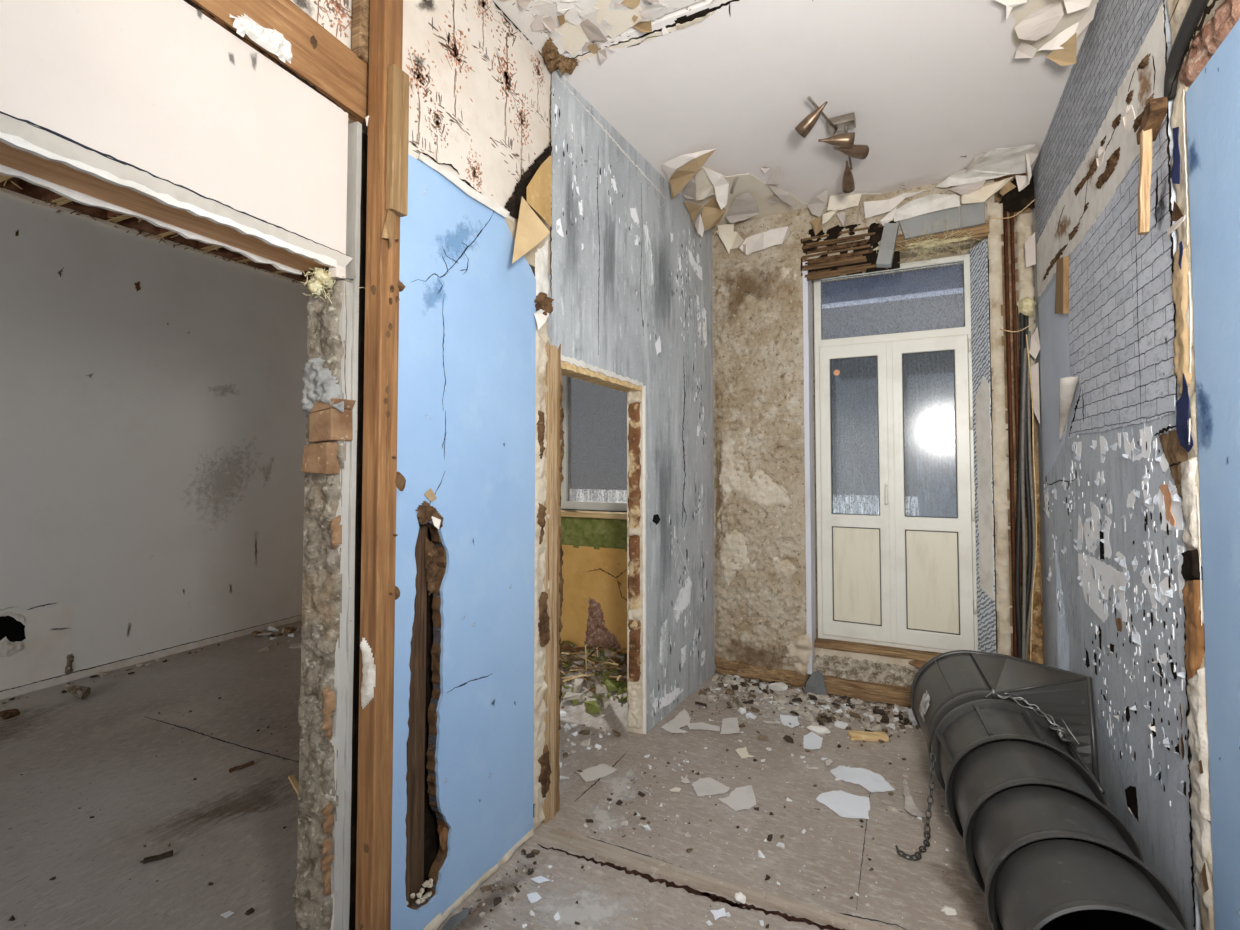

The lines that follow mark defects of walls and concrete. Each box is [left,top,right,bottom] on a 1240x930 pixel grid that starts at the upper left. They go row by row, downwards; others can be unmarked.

spalling [0,113,356,930]
spalling [405,488,449,910]
crack [412,150,494,504]
flaking render [423,0,715,930]
crack [538,754,906,930]
flaking render [785,634,812,675]
flaking render [661,0,1240,445]
flaking render [1021,377,1214,909]